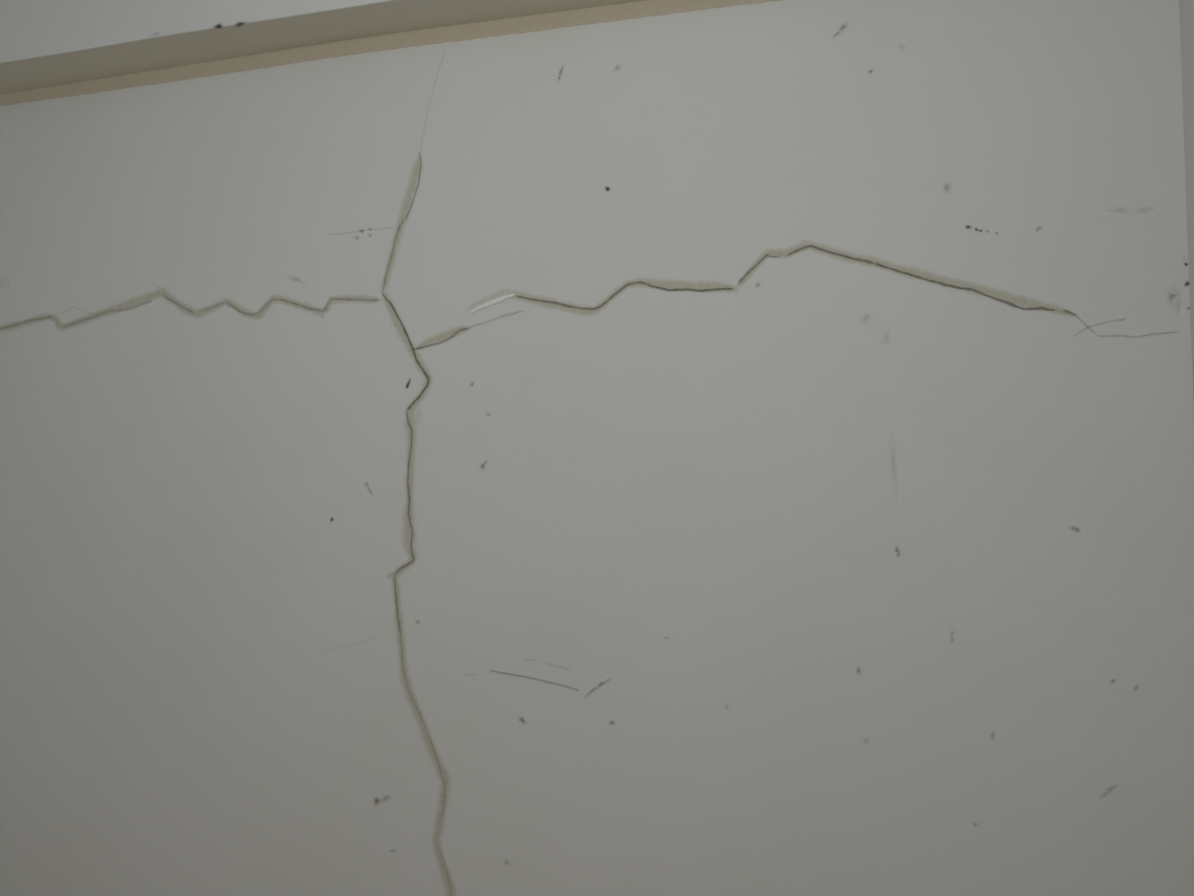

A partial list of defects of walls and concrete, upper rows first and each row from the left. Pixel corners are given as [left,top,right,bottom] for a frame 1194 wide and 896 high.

crack [0,155,1079,896]